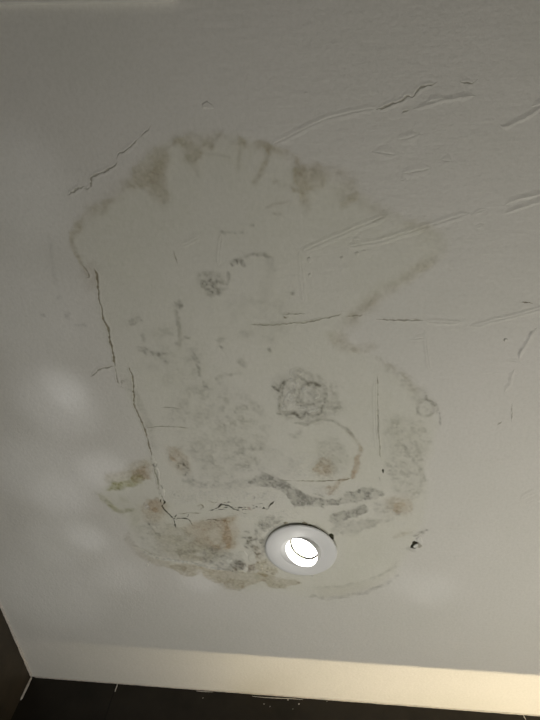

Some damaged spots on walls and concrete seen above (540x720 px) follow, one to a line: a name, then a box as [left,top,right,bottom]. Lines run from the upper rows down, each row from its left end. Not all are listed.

crack [67,124,152,196]
crack [82,265,275,527]